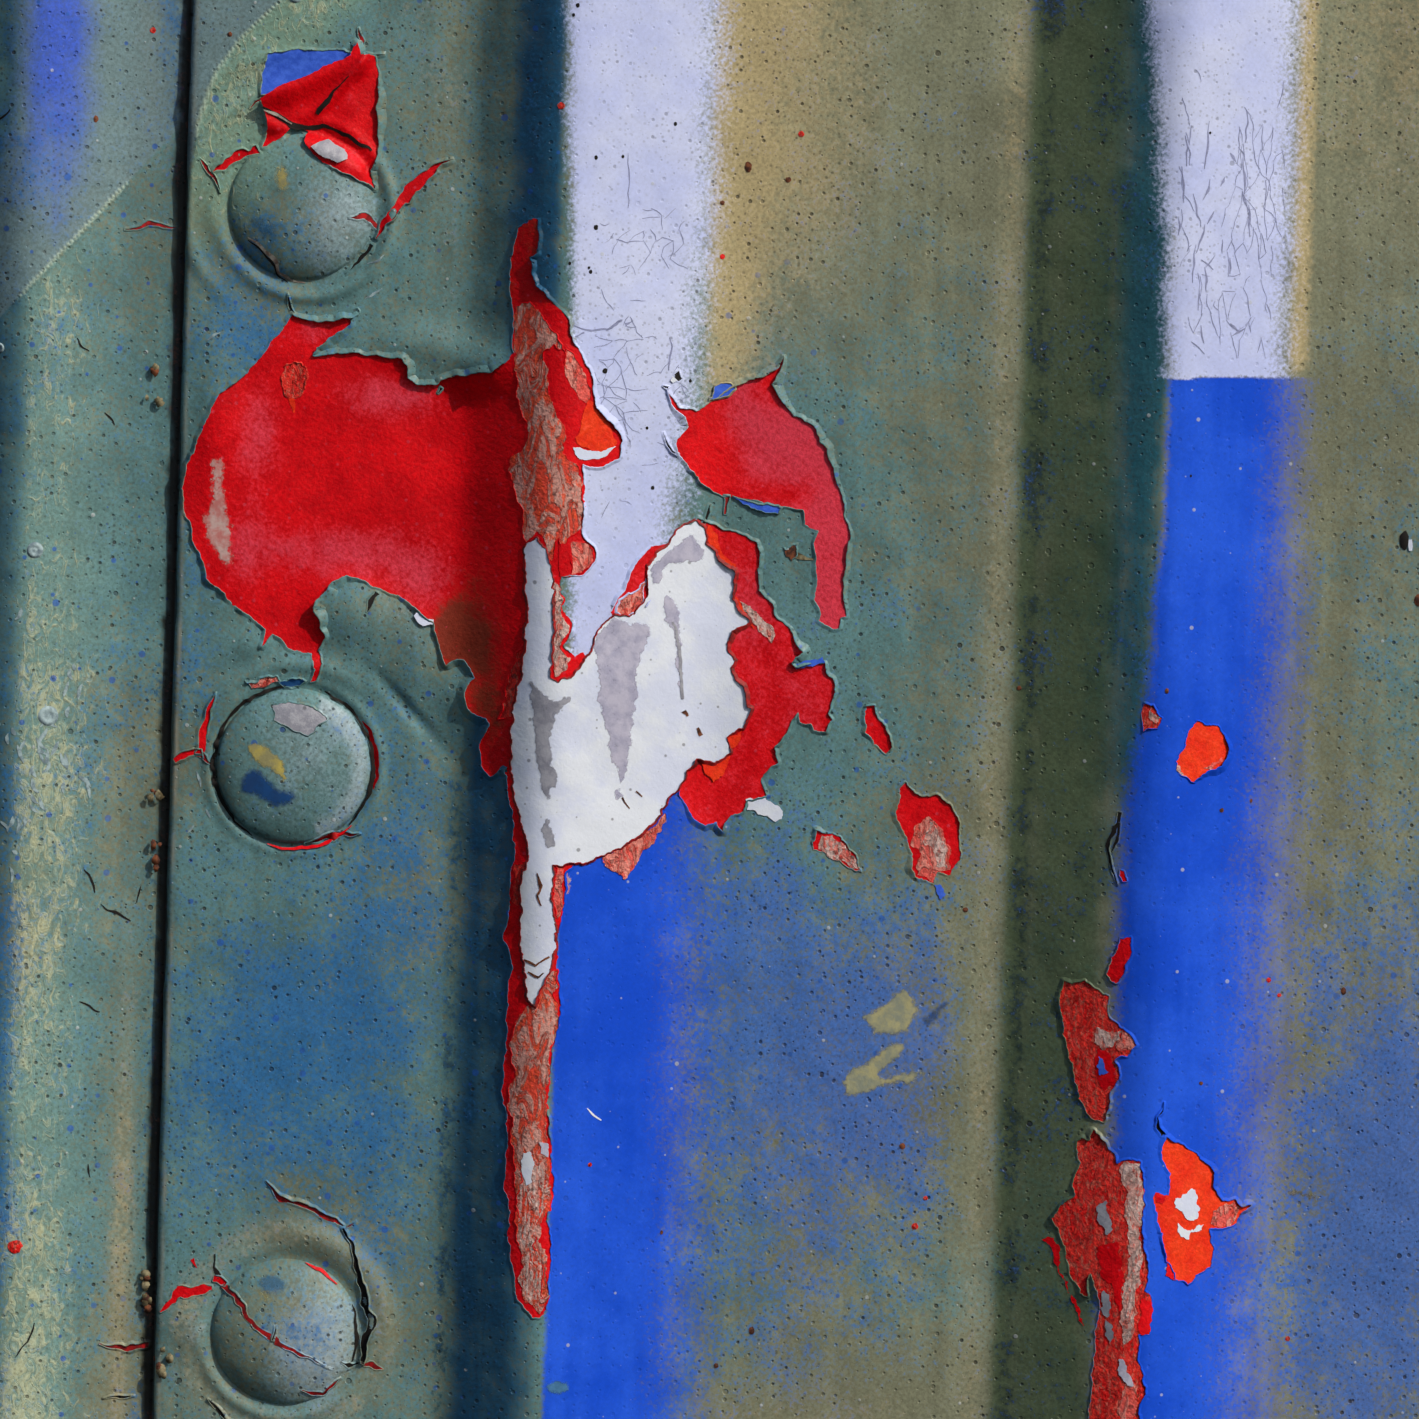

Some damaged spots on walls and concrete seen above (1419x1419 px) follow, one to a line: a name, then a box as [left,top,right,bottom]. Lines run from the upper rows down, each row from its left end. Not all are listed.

peeling [248,26,387,192]
peeling [177,218,862,1321]
peeling [860,703,894,756]
peeling [1175,719,1234,784]
peeling [890,781,962,899]
peeling [1042,935,1256,1419]
crack [98,1180,384,1397]
crack [101,1392,136,1400]
crack [207,1397,232,1419]